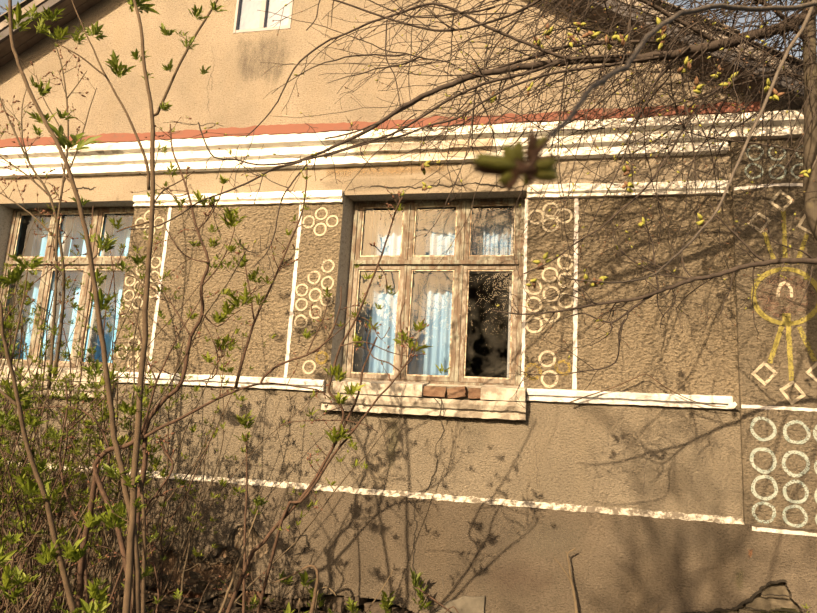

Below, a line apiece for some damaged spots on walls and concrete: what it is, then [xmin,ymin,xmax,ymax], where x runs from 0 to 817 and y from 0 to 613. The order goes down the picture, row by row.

crack [412,398,445,599]
crack [147,524,264,590]
spalling [150,524,273,604]
crack [273,534,309,562]
spalling [706,582,803,613]